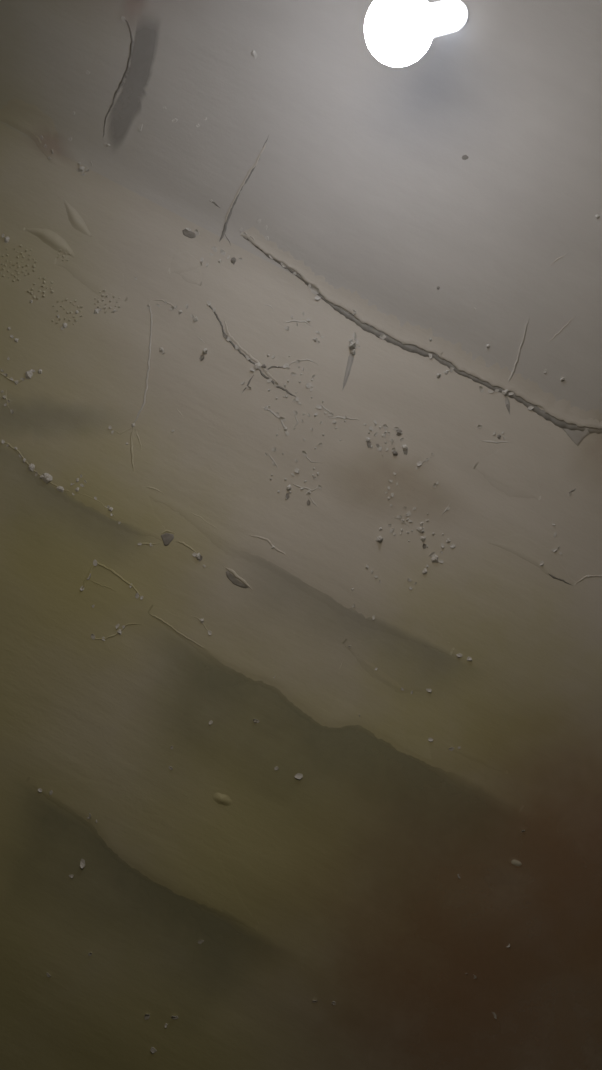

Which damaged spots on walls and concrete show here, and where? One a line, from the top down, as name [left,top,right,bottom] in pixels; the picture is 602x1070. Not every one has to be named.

crack [207,136,602,446]